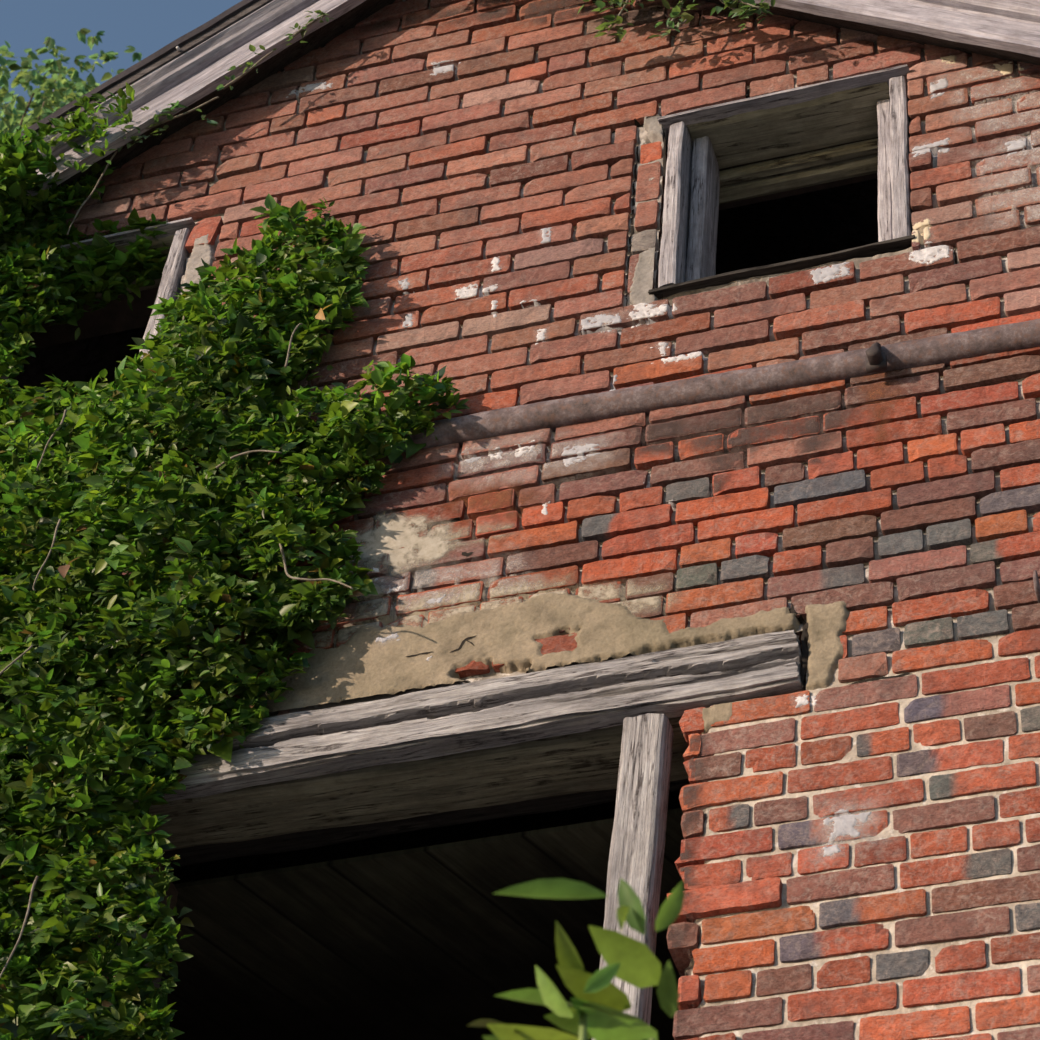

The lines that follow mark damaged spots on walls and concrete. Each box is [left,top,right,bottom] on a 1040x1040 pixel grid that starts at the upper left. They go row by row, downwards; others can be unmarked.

peeling [371,633,400,643]